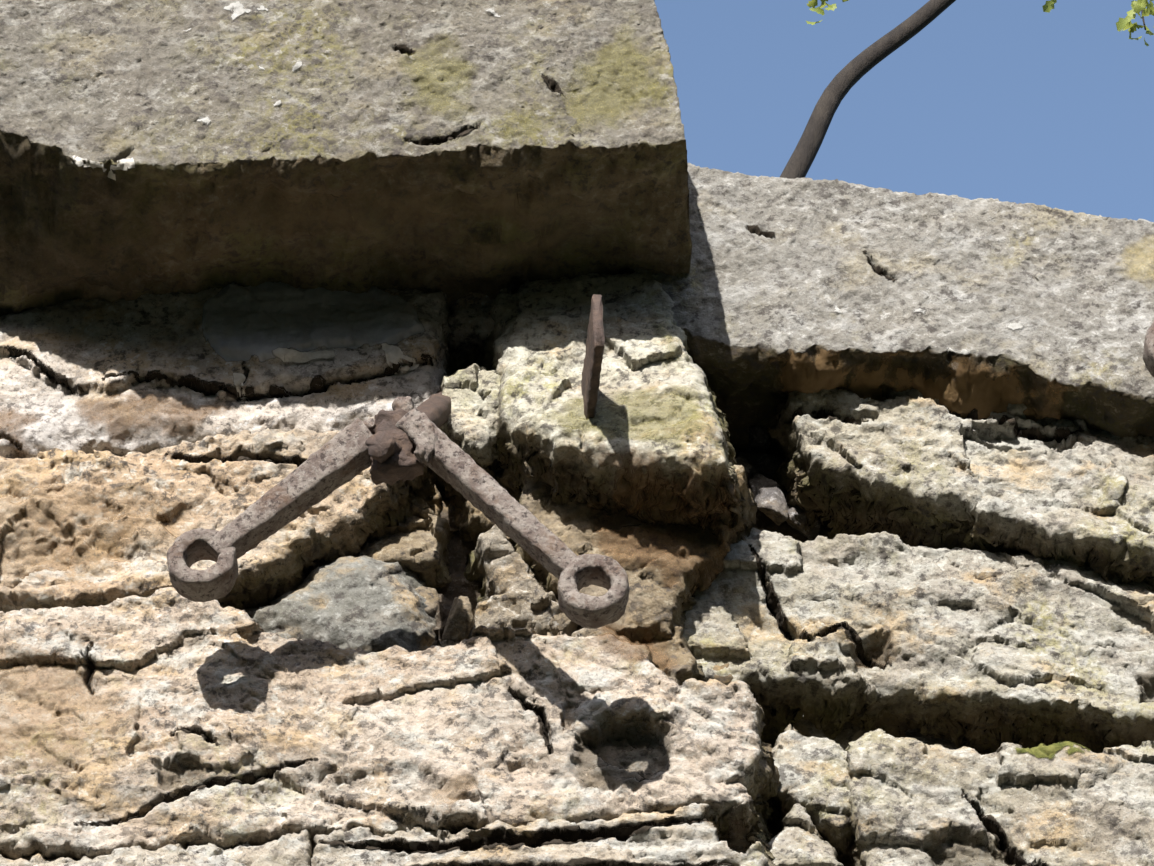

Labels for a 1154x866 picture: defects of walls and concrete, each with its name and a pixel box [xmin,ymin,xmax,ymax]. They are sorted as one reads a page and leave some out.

crack [4,345,437,402]
rust [598,453,727,590]
crack [750,544,892,670]
crack [85,646,96,694]
rust [602,625,671,668]